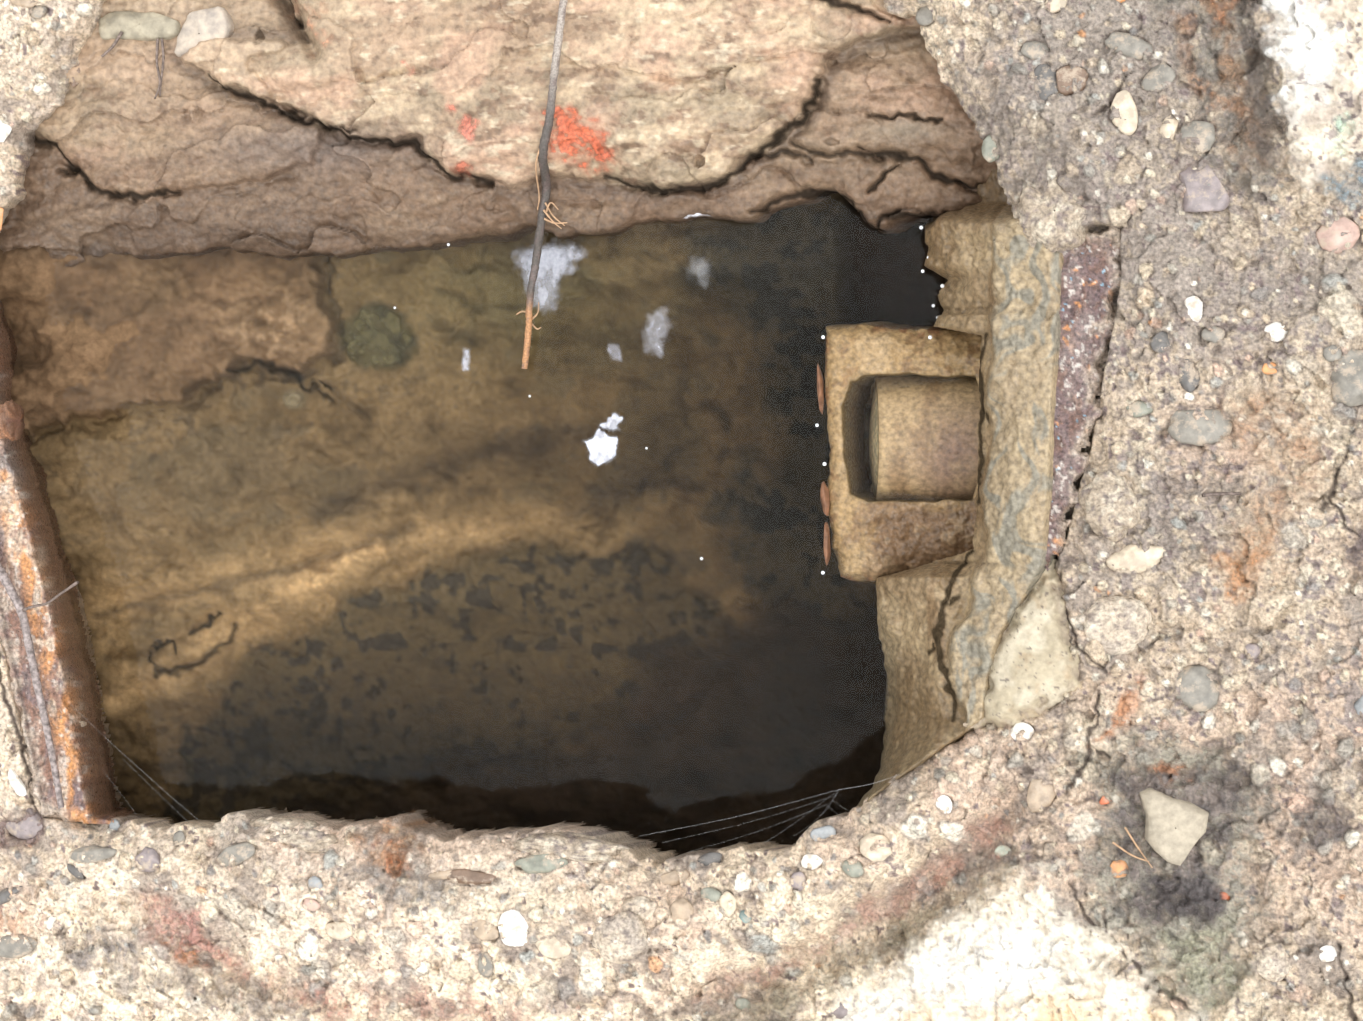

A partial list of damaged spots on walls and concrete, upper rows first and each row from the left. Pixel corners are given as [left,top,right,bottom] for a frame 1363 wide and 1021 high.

spalling [174,6,234,57]
crack [823,0,889,21]
crack [35,137,180,202]
crack [209,75,494,185]
crack [604,79,979,231]
peeling [586,414,622,465]